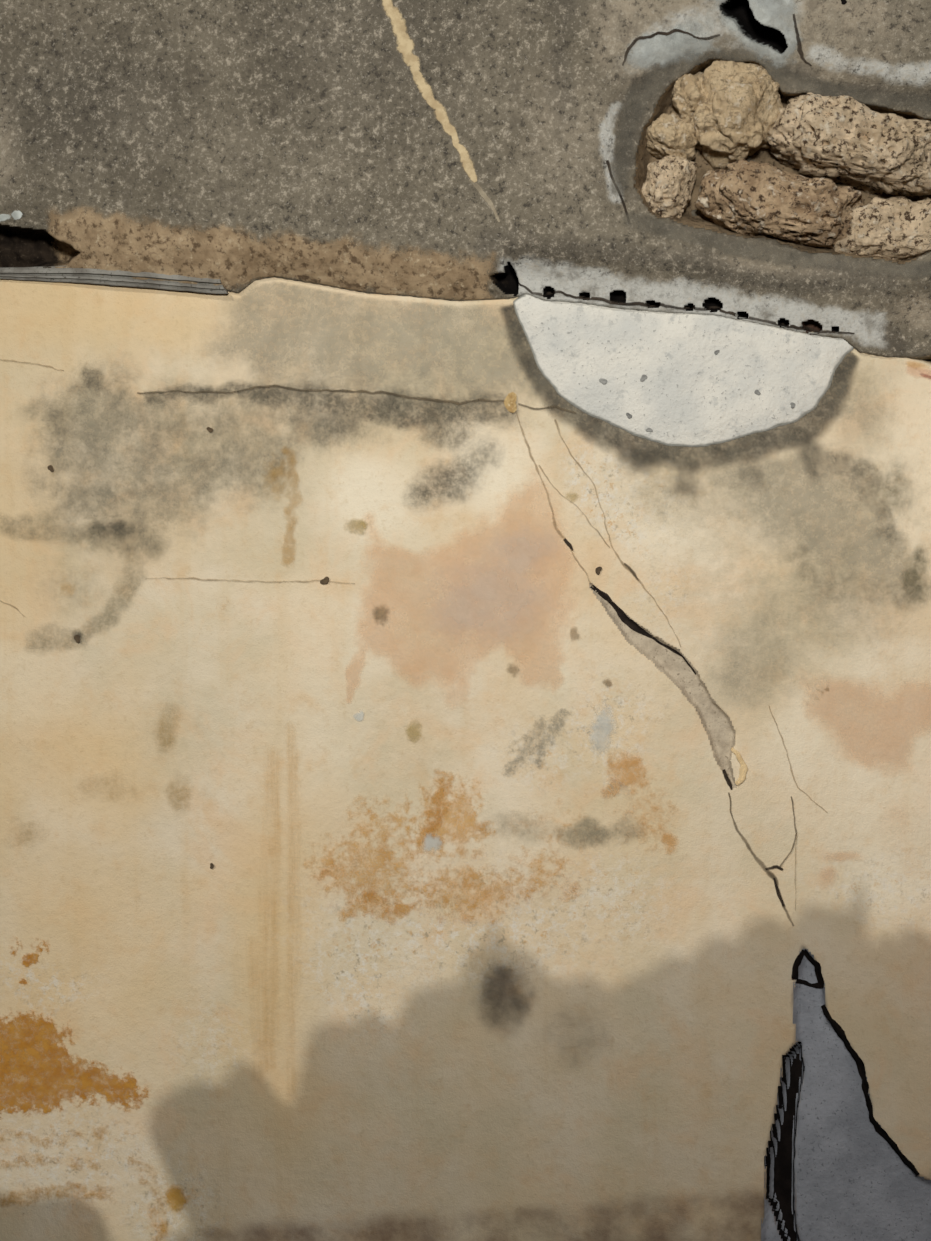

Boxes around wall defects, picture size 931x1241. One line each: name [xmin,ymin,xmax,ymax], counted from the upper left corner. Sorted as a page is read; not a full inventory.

crack [382,0,500,222]
flaking render [612,0,931,277]
peeling [0,208,519,300]
water stain [54,377,164,469]
crack [137,385,576,413]
water stain [719,445,920,588]
crack [589,583,797,912]